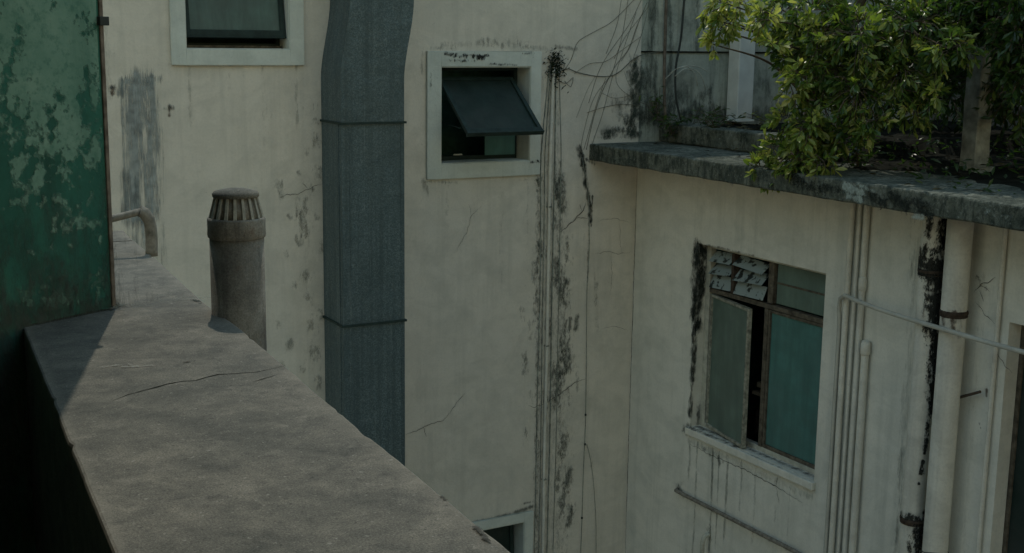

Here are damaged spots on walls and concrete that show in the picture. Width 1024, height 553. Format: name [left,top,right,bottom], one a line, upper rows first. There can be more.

peeling [0,0,105,248]
leakage [117,69,161,244]
leakage [604,1,733,138]
leakage [543,316,579,402]